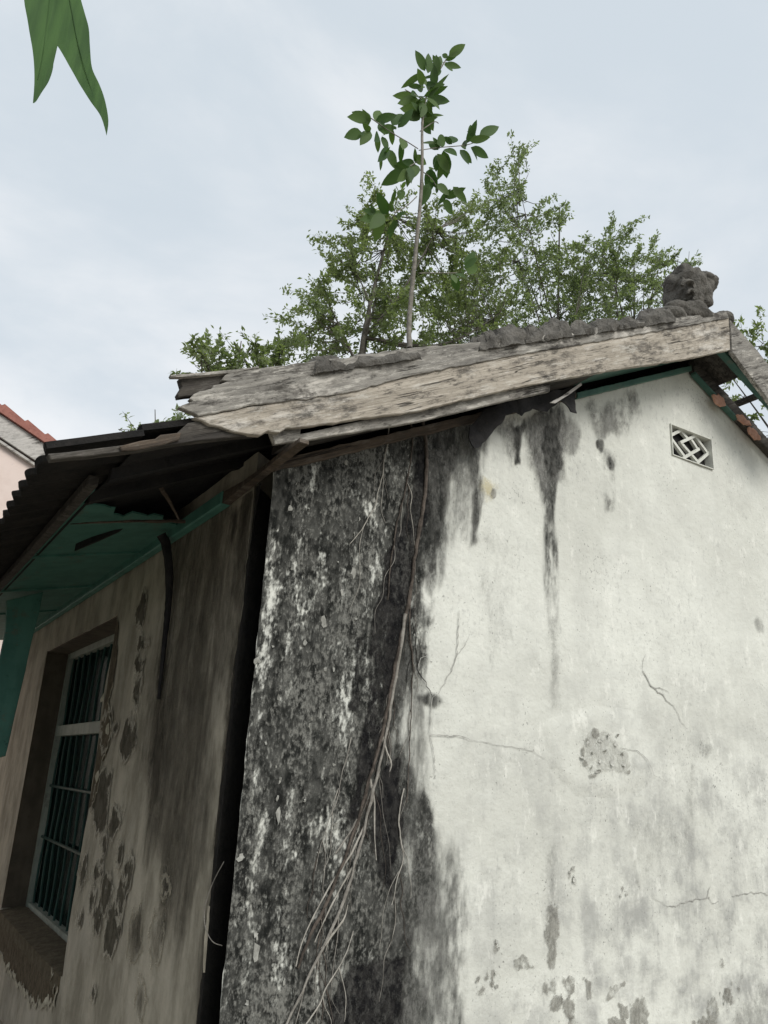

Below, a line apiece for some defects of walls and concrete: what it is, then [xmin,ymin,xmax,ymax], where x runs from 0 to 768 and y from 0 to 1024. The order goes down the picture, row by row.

water stain [589,393,637,470]
water stain [498,406,580,571]
peeling [75,589,150,962]
water stain [219,424,487,1024]
crack [405,619,543,774]
flaking render [580,728,631,778]
crack [642,659,685,726]
crack [654,886,767,907]
water stain [544,905,560,969]
peeling [476,970,498,995]
peeling [543,975,592,1024]
peeling [607,981,650,1024]